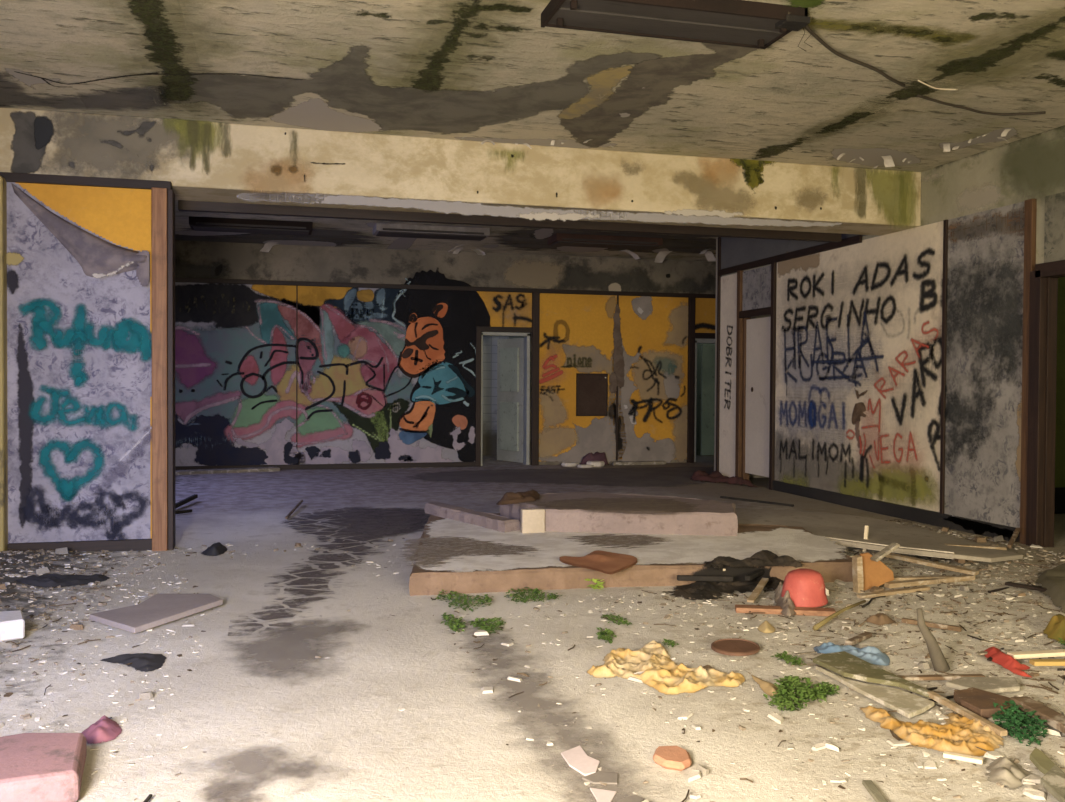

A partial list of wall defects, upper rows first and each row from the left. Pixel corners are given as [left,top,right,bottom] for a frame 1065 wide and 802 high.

water stain [969,12,1029,21]
water stain [886,17,1065,100]
water stain [0,0,771,179]
water stain [676,173,753,213]
water stain [799,193,822,208]
water stain [856,167,916,225]
spalling [504,259,561,289]
peeling [632,296,653,320]
peeling [539,305,688,464]
water stain [338,508,430,537]
water stain [240,621,350,676]